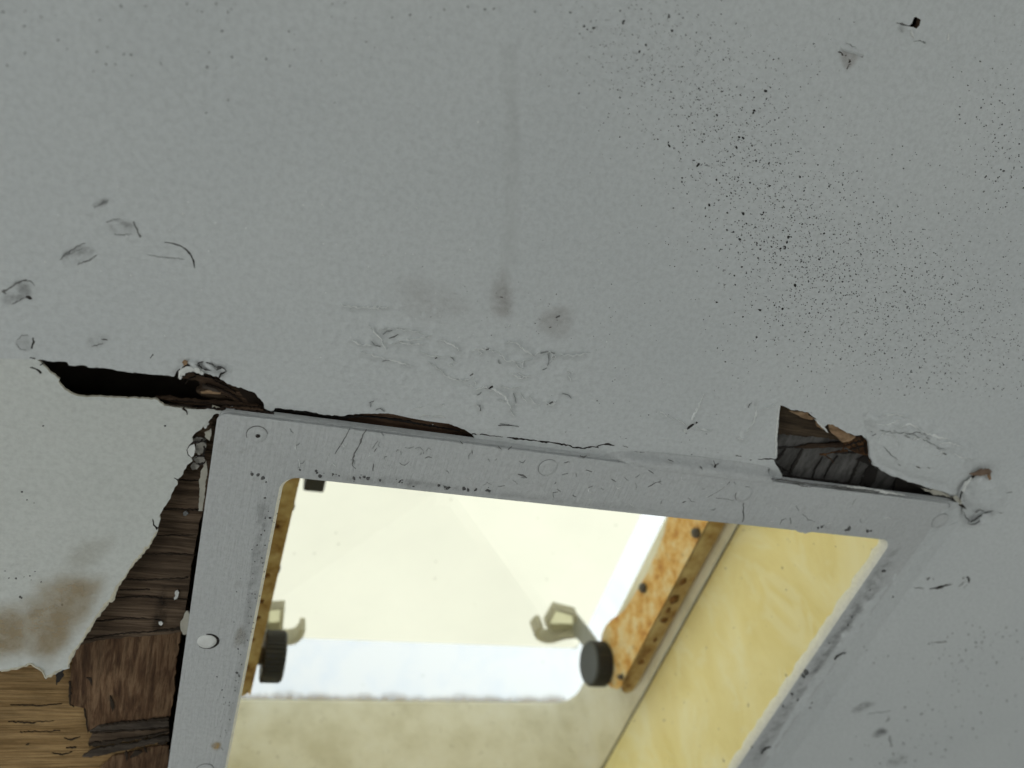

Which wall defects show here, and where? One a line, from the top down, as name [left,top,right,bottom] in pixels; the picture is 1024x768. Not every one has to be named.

leakage [561,0,1024,399]
peeling [0,359,221,679]
crack [170,349,748,522]
rust [660,578,687,623]
peeling [789,410,855,442]
peeling [842,485,905,496]